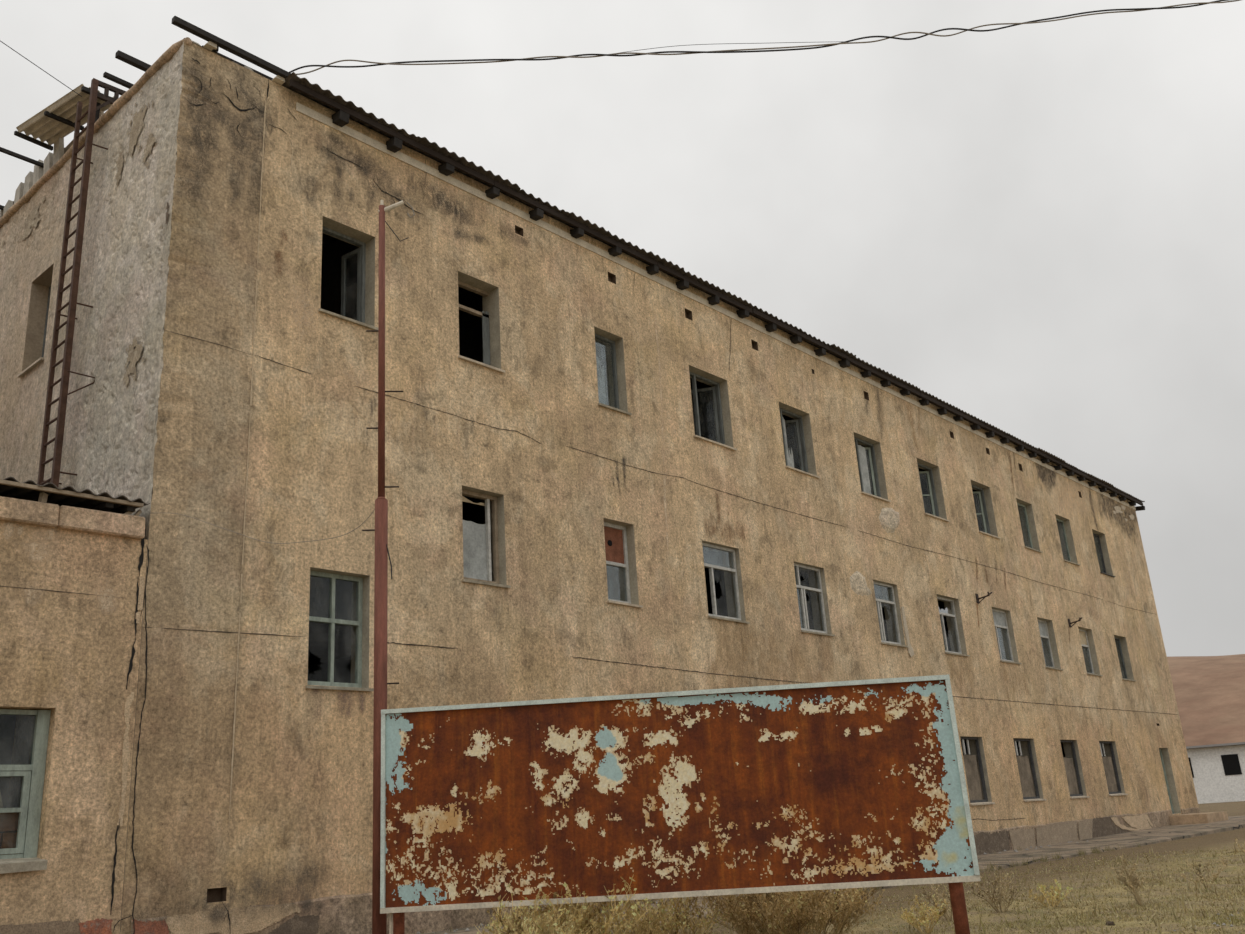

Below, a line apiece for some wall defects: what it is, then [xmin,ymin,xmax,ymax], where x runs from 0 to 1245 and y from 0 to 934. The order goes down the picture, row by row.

crack [2,57,311,934]
crack [387,641,458,649]
crack [570,656,804,683]
crack [953,696,1168,714]
spalling [0,918,113,934]
flaking render [133,902,319,934]